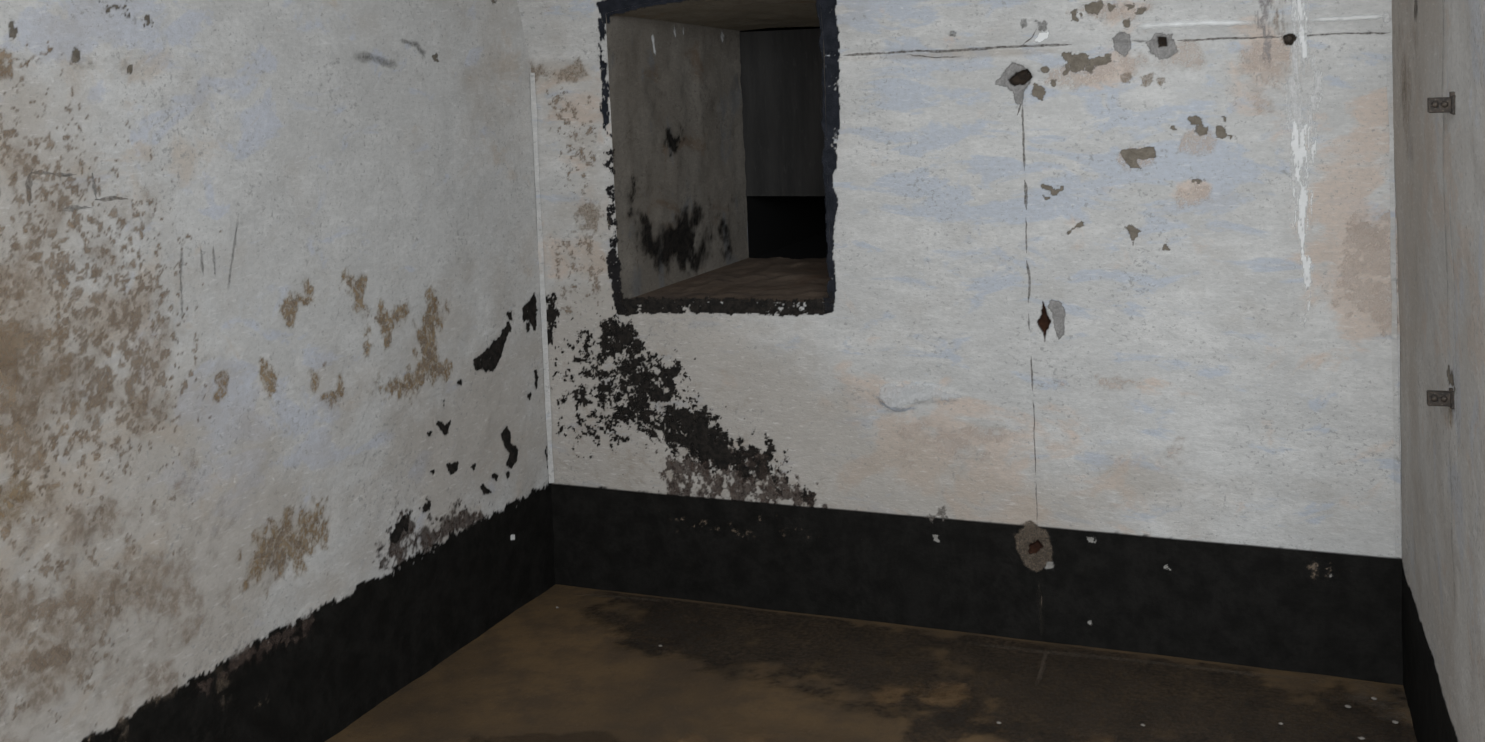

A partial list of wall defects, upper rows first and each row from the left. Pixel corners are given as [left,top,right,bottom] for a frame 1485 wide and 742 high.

leakage [0,22,30,81]
leakage [99,0,154,27]
flaking render [1021,20,1049,43]
flaking render [1071,0,1148,27]
flaking render [1009,52,1165,101]
flaking render [1118,147,1156,169]
flaking render [1171,116,1232,152]
leakage [531,60,827,508]
leakage [0,92,207,539]
leakage [377,499,487,576]
spalling [1028,540,1054,569]
leakage [0,524,187,720]